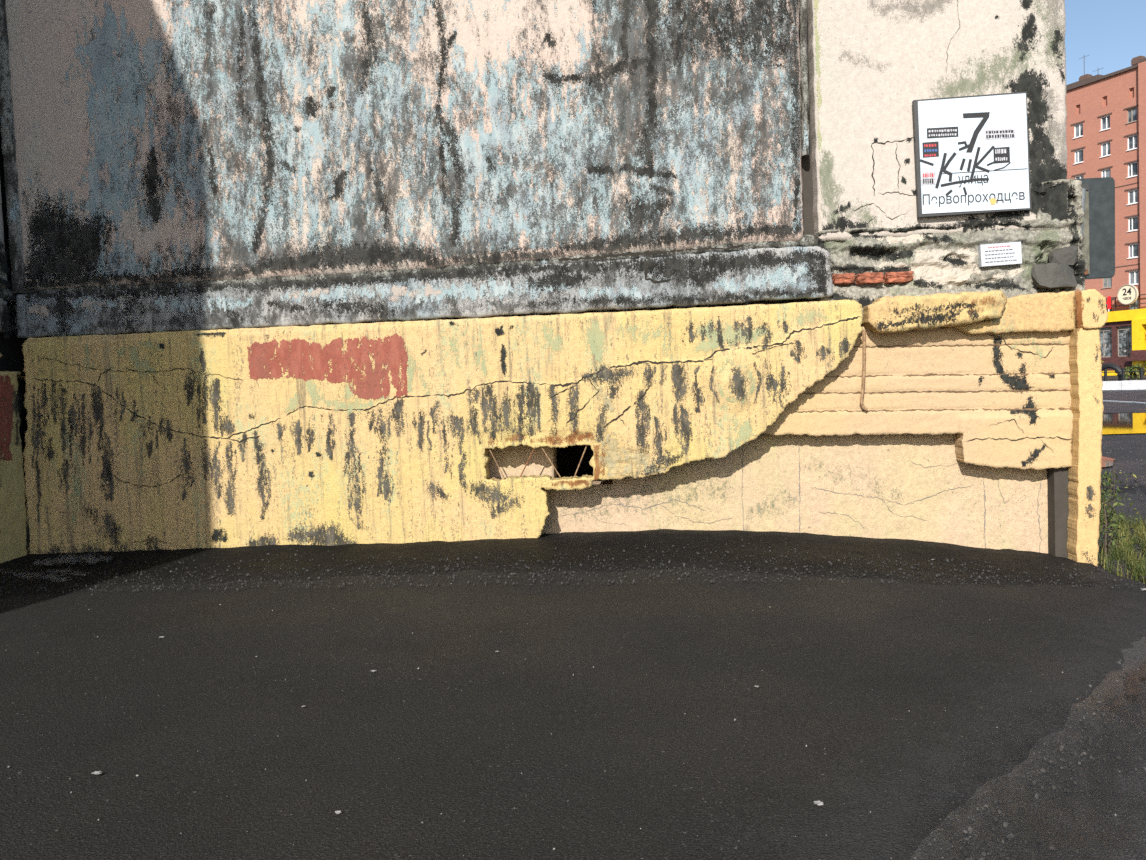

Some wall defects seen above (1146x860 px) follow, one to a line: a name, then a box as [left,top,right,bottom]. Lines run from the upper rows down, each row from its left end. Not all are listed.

peeling [814,0,824,150]
peeling [20,0,802,279]
damp [0,0,1105,411]
peeling [832,230,1028,291]
damp [1,349,580,582]
crack [33,316,863,442]
damp [635,360,705,470]
peeling [978,335,1061,425]
peeling [1021,443,1045,468]
damp [1085,481,1146,518]